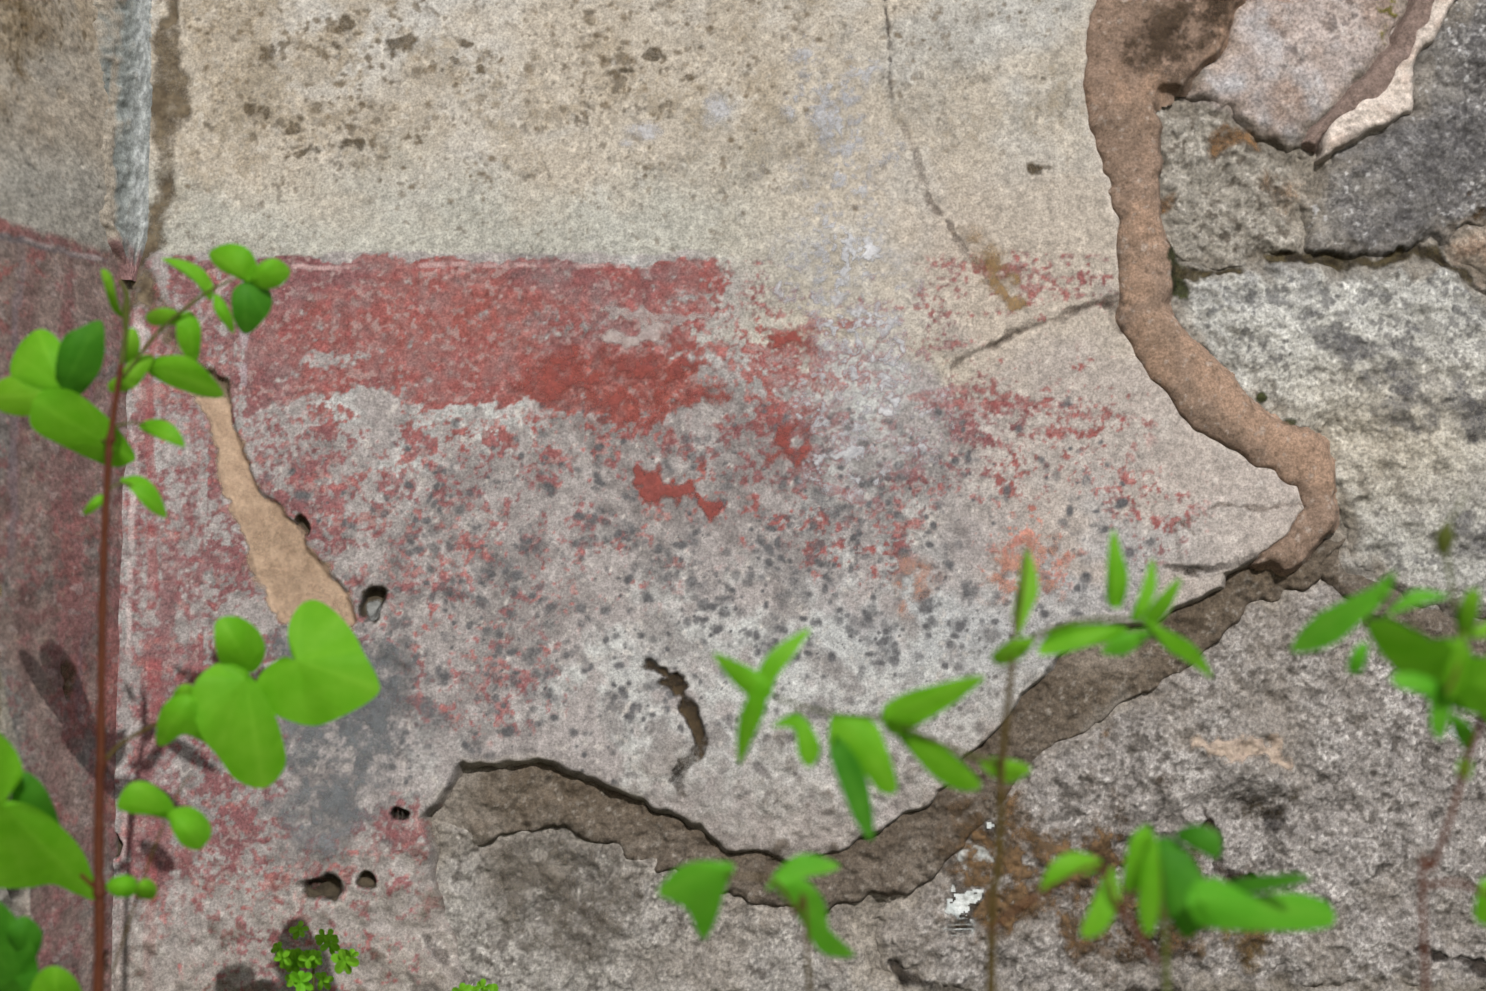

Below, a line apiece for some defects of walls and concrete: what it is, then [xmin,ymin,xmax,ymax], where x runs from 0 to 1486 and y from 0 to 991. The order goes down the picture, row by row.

crack [127,0,230,397]
crack [926,197,966,248]
crack [1066,294,1125,328]
peeling [768,330,811,348]
crack [956,329,1021,362]
peeling [519,340,730,424]
peeling [766,419,812,466]
spalling [189,367,356,627]
peeling [633,464,723,520]
crack [643,659,708,783]
crack [7,888,19,899]
spalling [0,888,30,918]